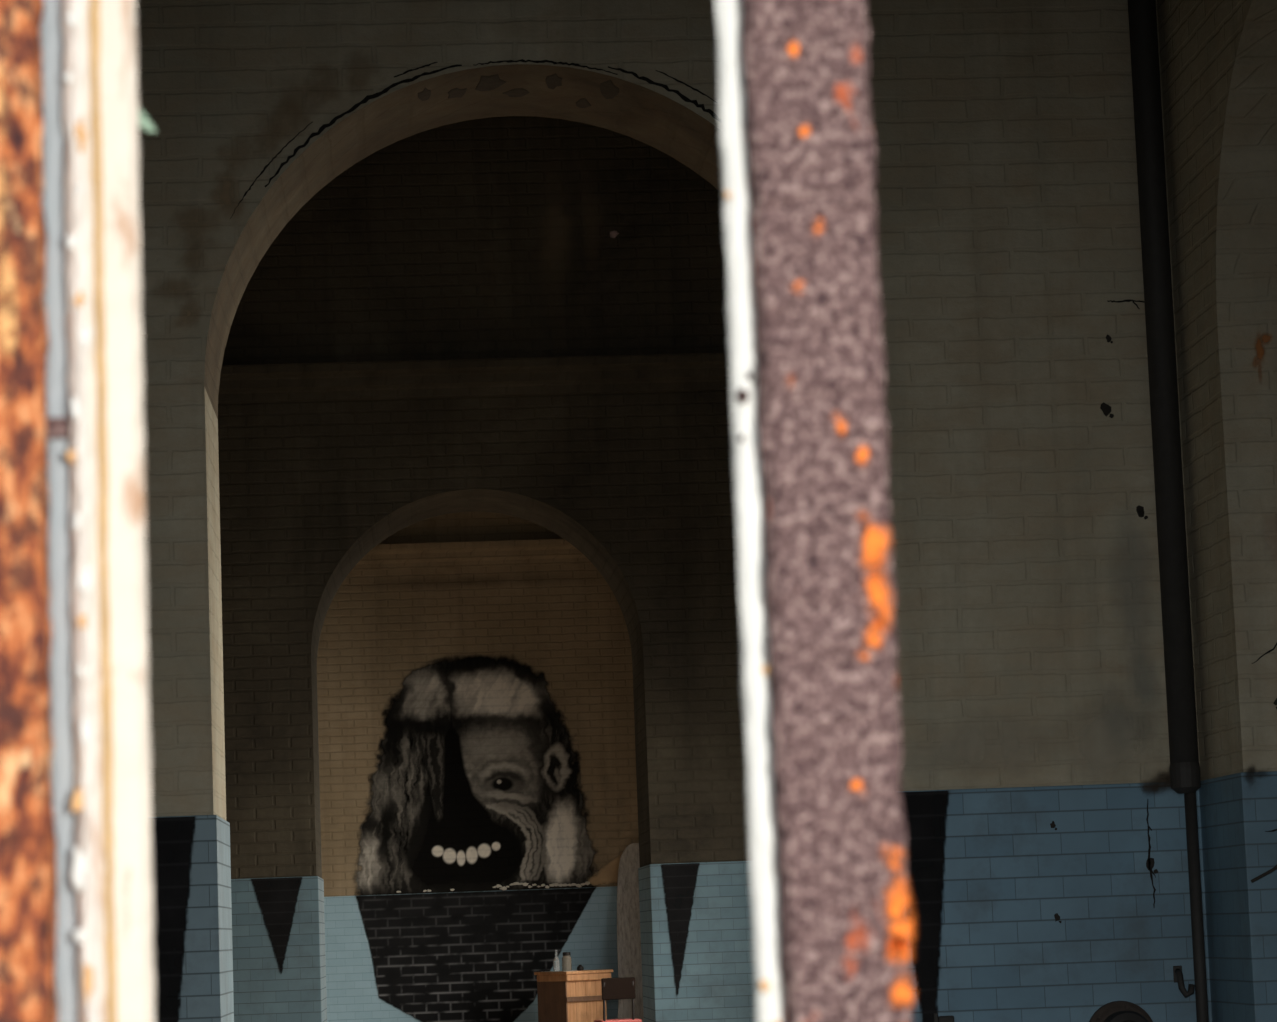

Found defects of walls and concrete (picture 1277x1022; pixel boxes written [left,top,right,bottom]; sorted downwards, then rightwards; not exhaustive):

rust [788,42,799,57]
rust [0,256,17,352]
rust [856,447,869,464]
rust [860,526,890,659]
rust [851,779,863,791]
crack [1146,800,1156,908]
rust [888,848,913,963]
rust [892,981,914,1007]